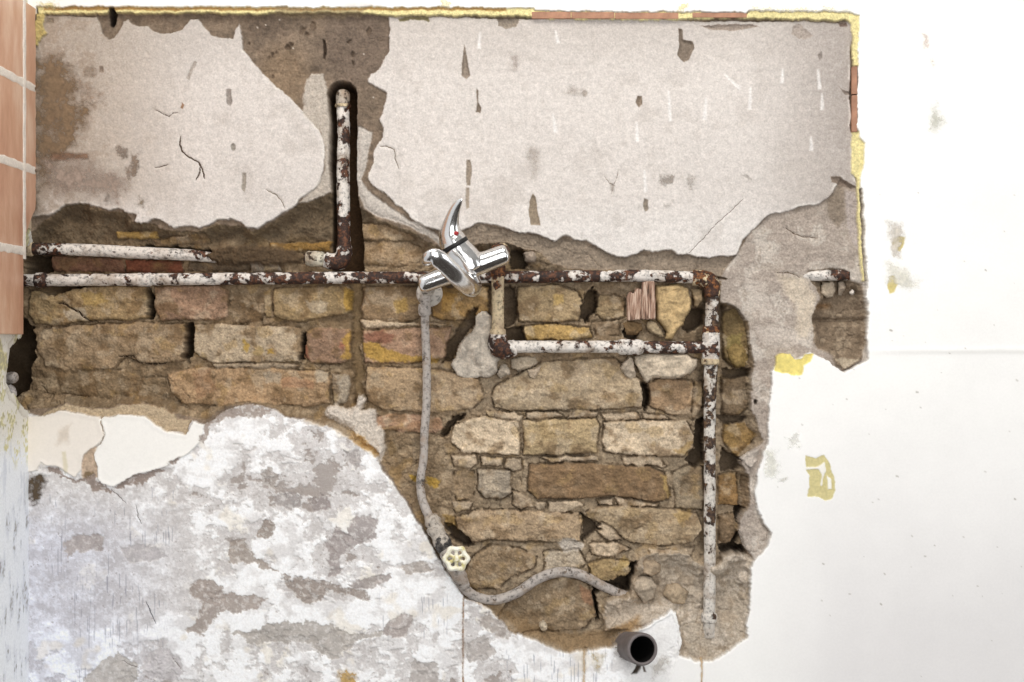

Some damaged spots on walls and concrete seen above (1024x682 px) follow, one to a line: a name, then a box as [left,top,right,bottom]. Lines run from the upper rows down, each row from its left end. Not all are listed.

crack [155,110,205,180]
flaking render [7,283,704,682]
flaking render [23,12,870,566]